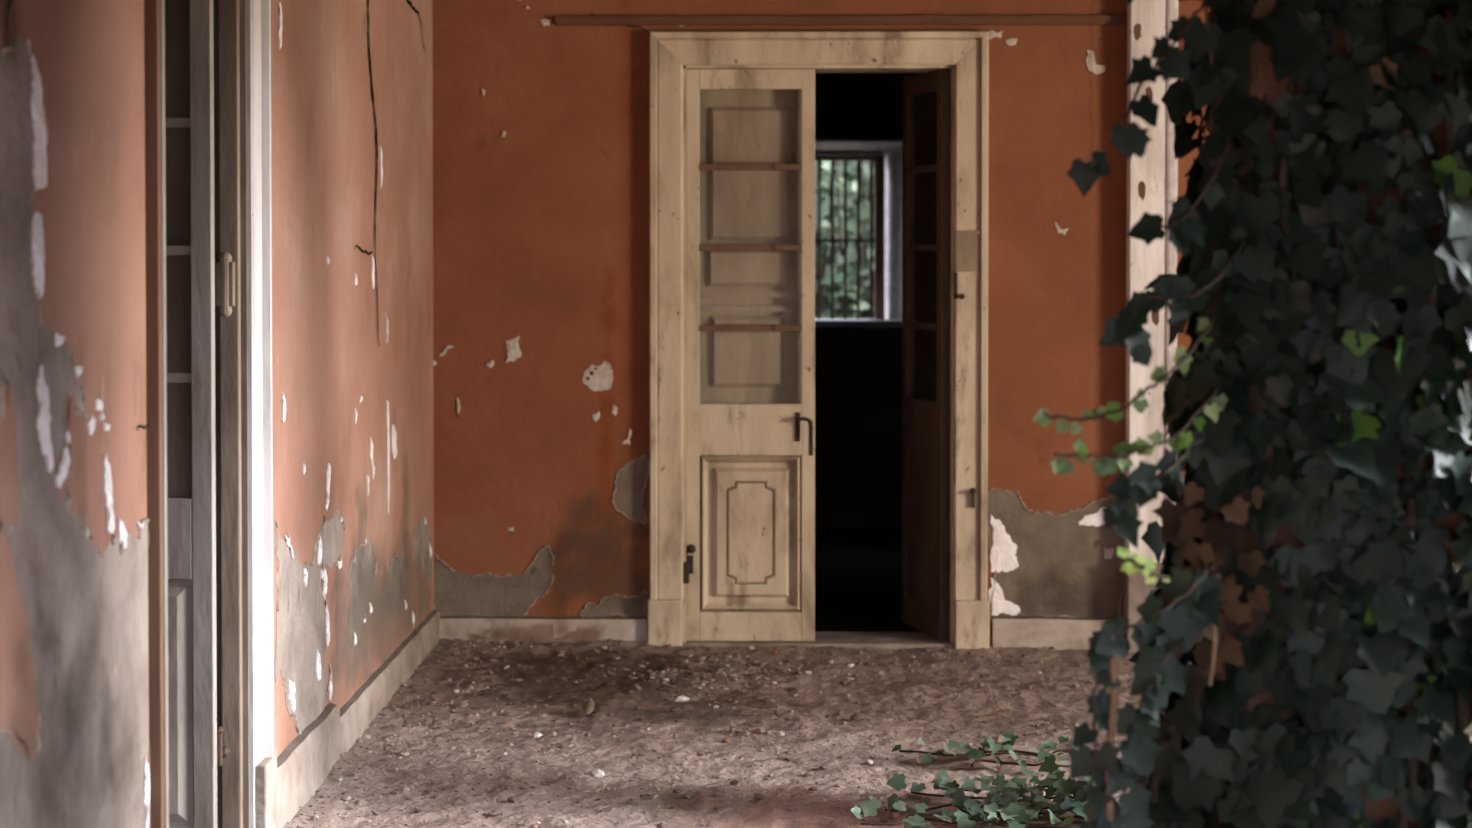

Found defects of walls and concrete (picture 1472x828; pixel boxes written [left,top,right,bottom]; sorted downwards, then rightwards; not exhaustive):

crack [408,0,425,48]
crack [354,0,380,347]
peeling [0,36,150,828]
peeling [366,400,397,514]
peeling [486,336,521,368]
peeling [583,360,617,421]
peeling [611,429,650,525]
peeling [275,463,555,735]
peeling [579,591,647,618]
peeling [988,487,1125,620]